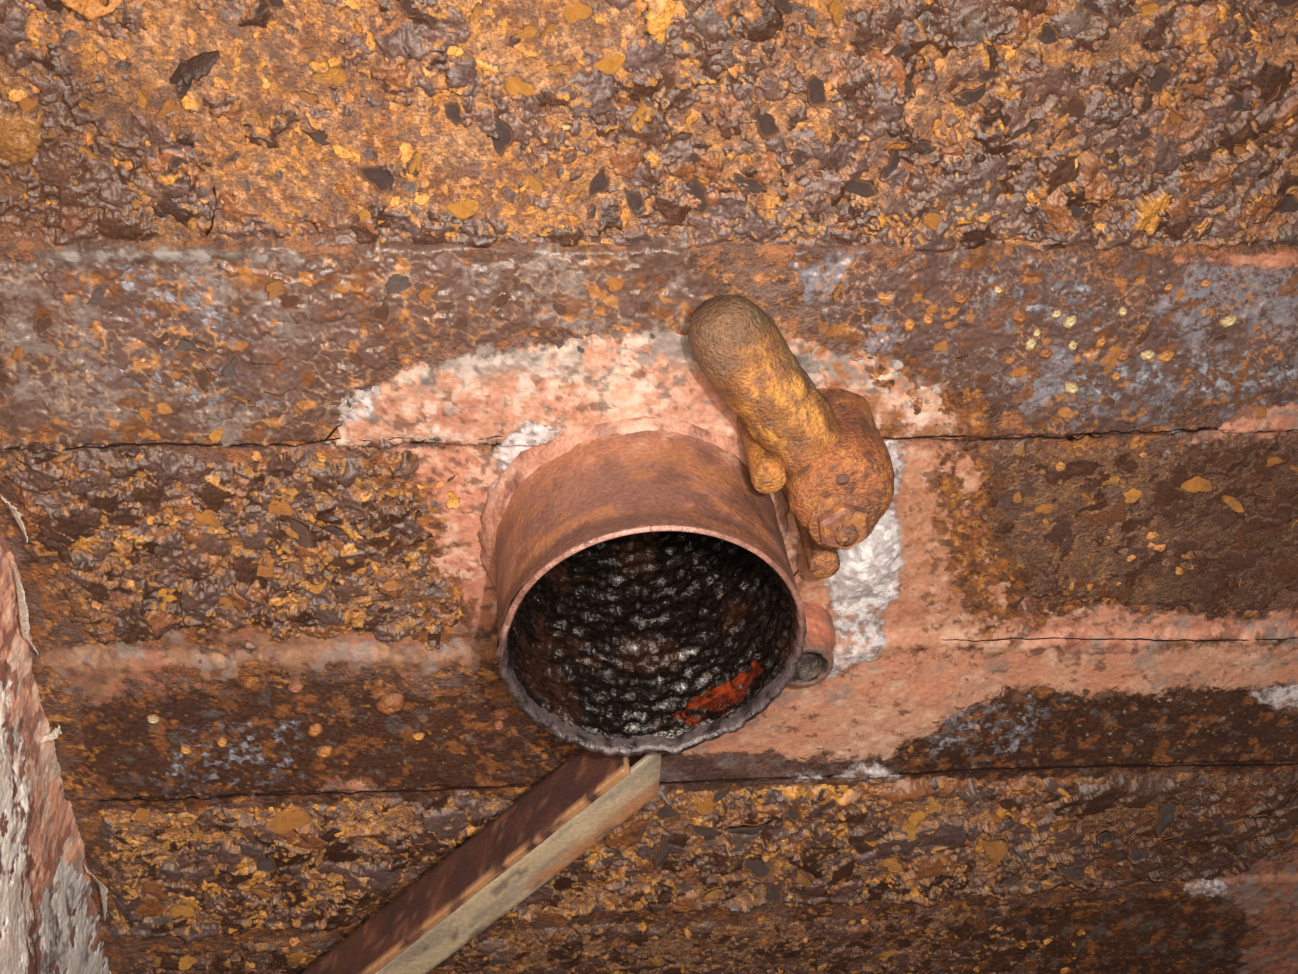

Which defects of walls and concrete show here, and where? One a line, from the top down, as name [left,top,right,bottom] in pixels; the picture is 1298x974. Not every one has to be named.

peeling [87,288,104,305]
peeling [266,279,302,309]
peeling [371,274,439,324]
peeling [605,277,626,292]
peeling [0,300,742,974]
rust [677,660,763,724]
peeling [1196,845,1298,974]